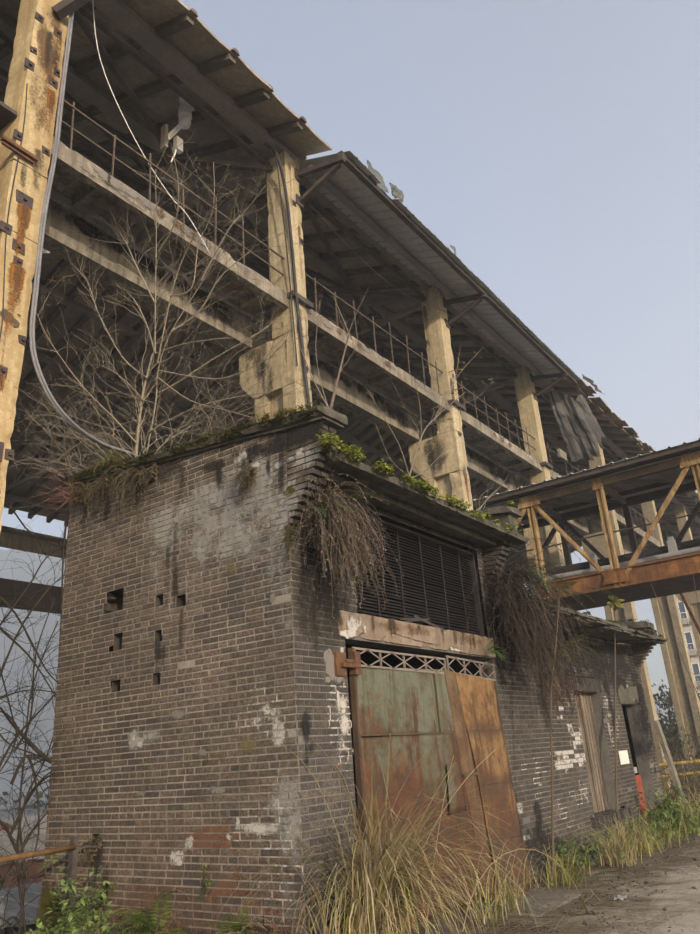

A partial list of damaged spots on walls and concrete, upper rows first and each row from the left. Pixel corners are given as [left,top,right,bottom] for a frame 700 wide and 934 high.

rust [46,88,55,114]
rust [15,203,31,253]
rust [4,263,25,336]
damp [75,445,321,594]
damp [285,540,349,647]
peeling [340,615,366,639]